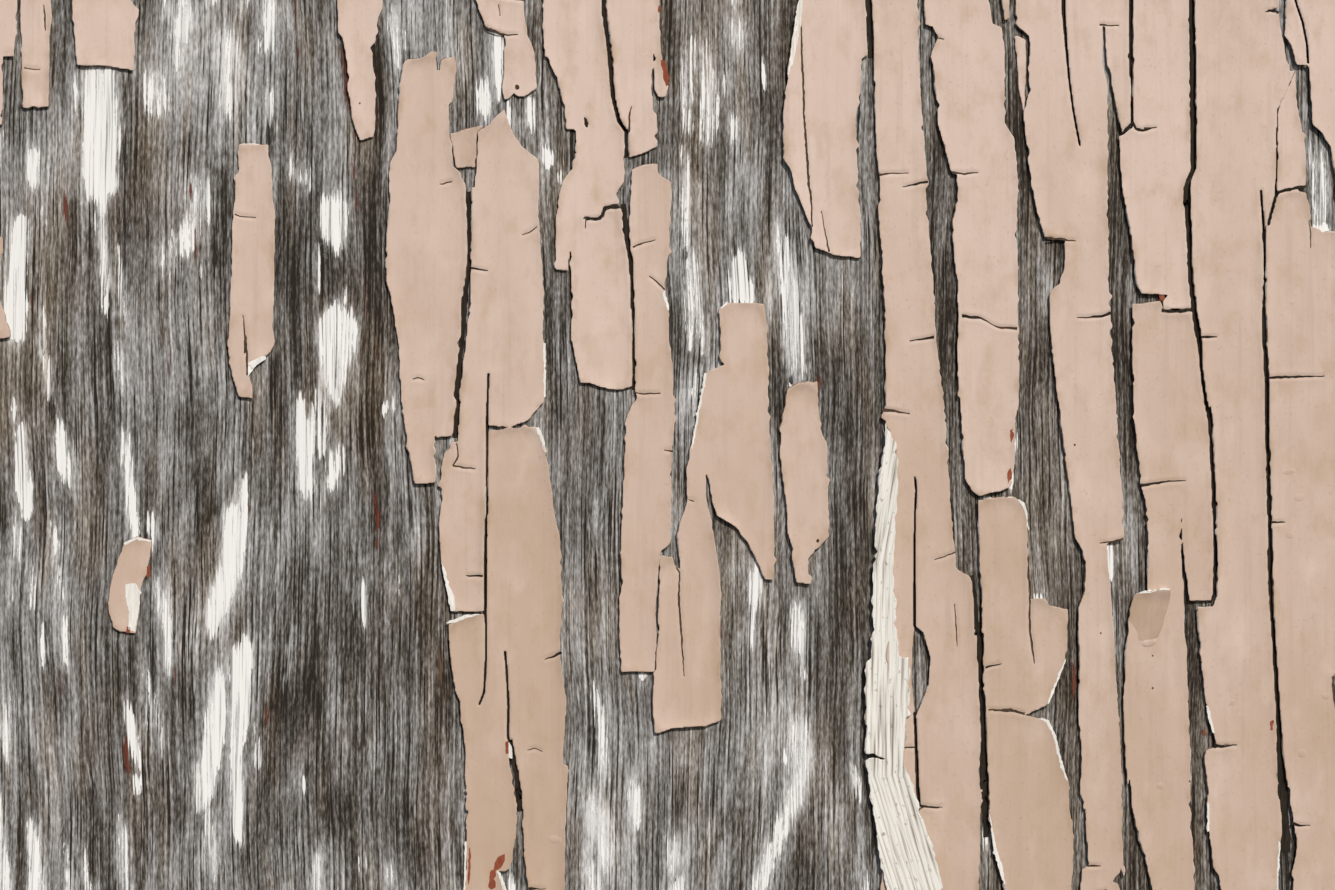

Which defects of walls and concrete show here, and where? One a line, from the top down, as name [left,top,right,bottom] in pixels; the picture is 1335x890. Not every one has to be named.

peeling [0,0,52,126]
peeling [71,0,139,70]
peeling [337,0,383,140]
crack [584,0,632,157]
peeling [227,143,275,399]
crack [413,181,541,812]
peeling [385,0,830,890]
crack [585,204,665,395]
crack [913,477,1025,837]
peeling [783,0,1335,890]
crack [1141,0,1217,603]
crack [1260,109,1324,852]